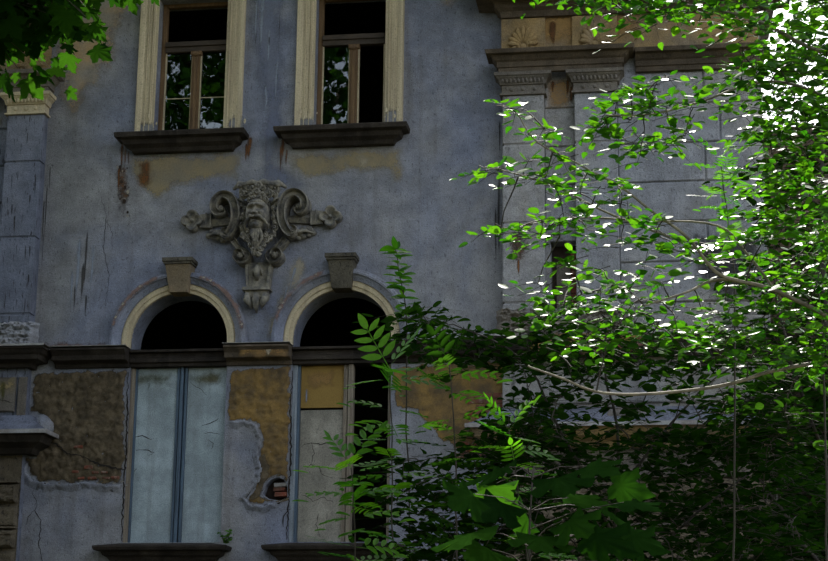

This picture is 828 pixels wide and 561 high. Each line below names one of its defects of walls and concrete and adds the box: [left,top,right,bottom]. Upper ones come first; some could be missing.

flaking render [24,369,128,494]
flaking render [226,366,291,513]
flaking render [393,361,502,458]